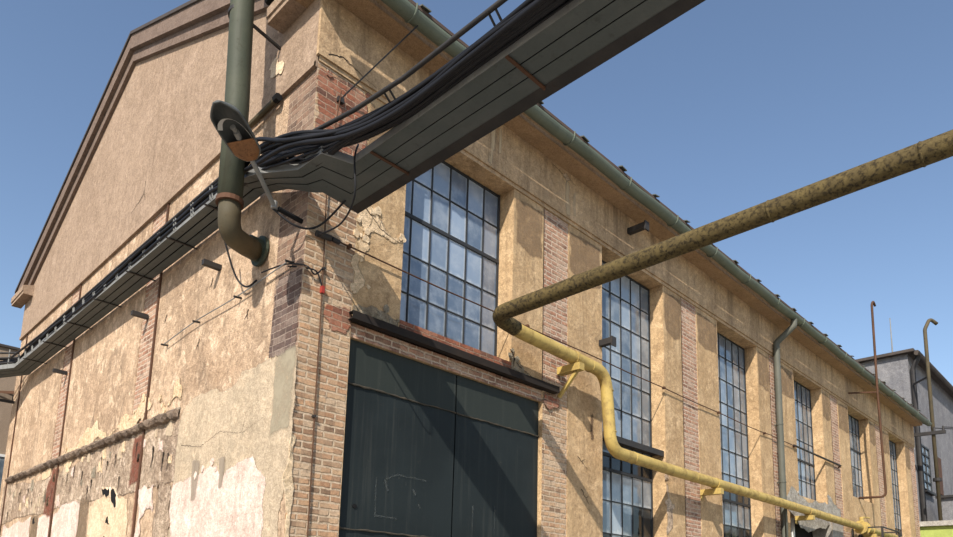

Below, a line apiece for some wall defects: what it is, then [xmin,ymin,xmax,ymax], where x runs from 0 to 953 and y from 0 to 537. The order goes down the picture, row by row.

peeling [323,206,406,335]
spalling [0,378,266,537]
peeling [282,433,296,537]